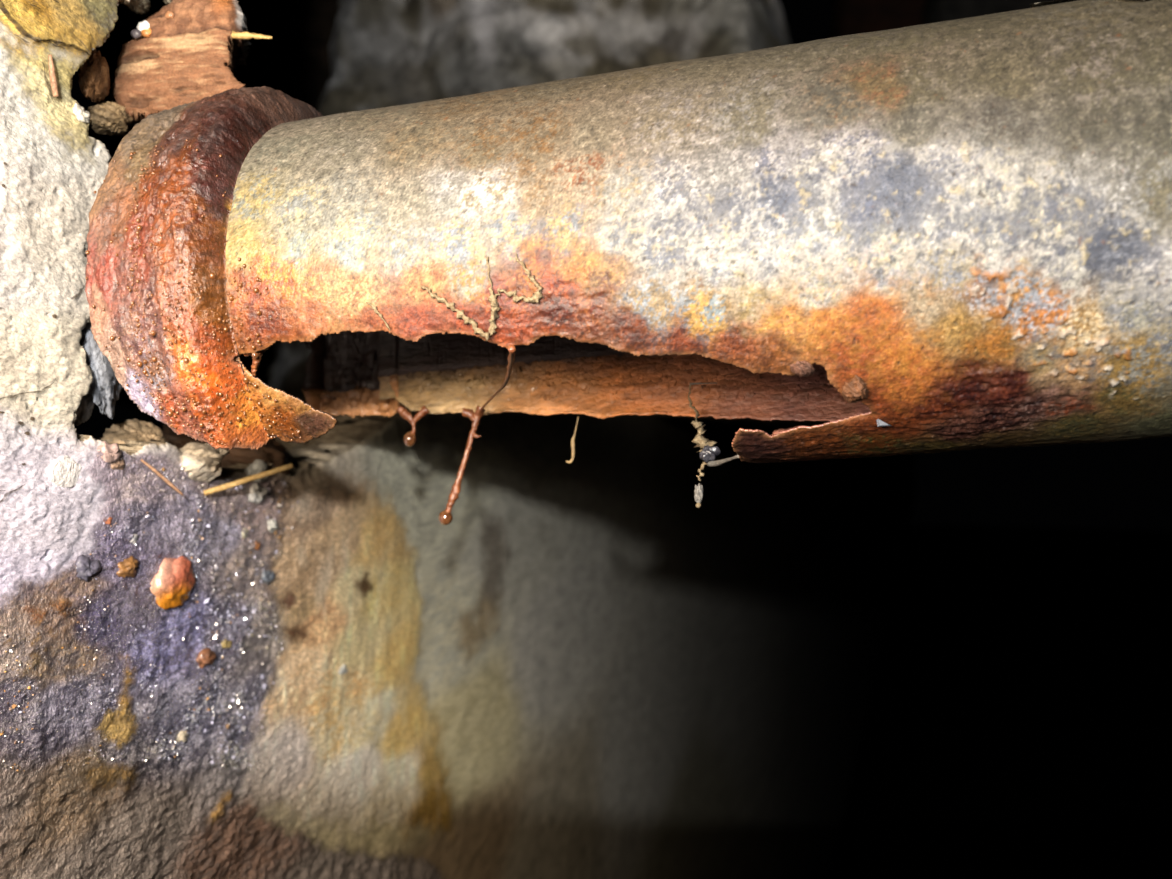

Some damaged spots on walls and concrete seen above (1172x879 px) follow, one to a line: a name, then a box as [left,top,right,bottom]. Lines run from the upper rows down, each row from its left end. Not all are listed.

crack [0,0,90,101]
leakage [0,0,118,149]
corrosion [243,346,271,377]
corrosion [396,405,430,447]
leakage [0,451,450,879]